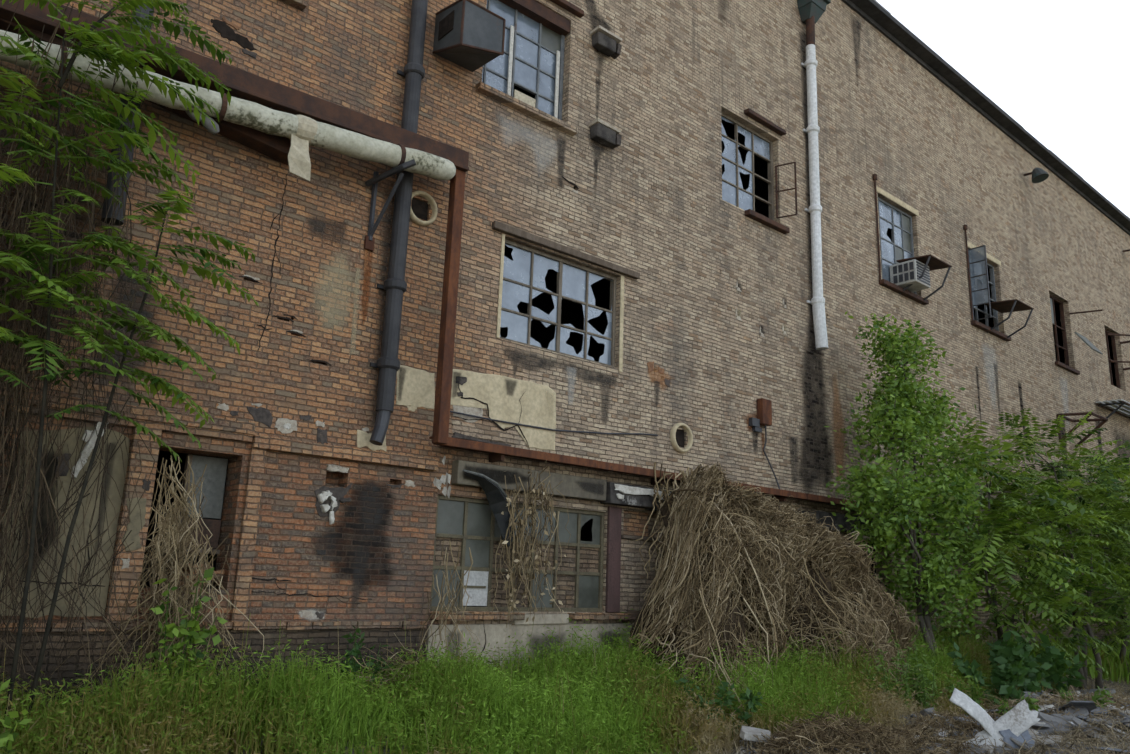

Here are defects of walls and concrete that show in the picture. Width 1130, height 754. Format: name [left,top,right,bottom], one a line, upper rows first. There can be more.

spalling [211,16,257,59]
crack [257,173,288,351]
damp [790,34,831,494]
spalling [217,403,328,444]
peeling [450,369,556,451]
damp [316,481,392,606]